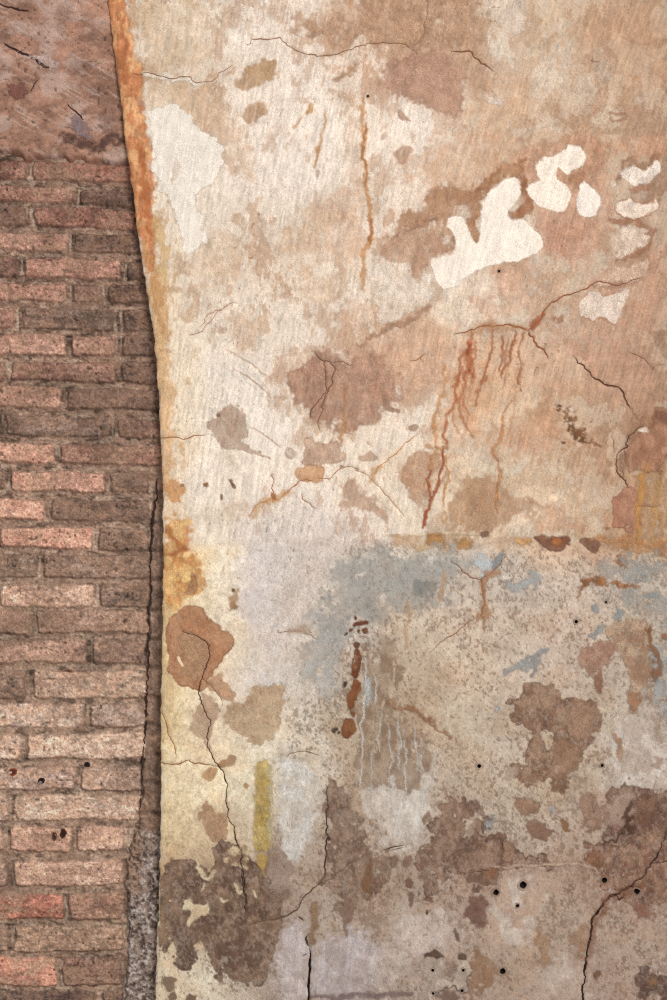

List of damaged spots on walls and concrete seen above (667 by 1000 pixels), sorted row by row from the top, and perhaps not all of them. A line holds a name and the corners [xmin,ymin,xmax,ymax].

peeling [147,103,224,255]
crack [310,353,349,430]
corrosion [360,97,374,292]
corrosion [393,333,523,553]
peeling [361,140,601,347]
crack [455,277,641,356]
peeling [579,155,661,325]
crack [137,478,356,1000]
corrosion [331,616,368,738]
spalling [124,801,294,1000]
spalling [309,901,319,944]
crack [581,834,667,1000]